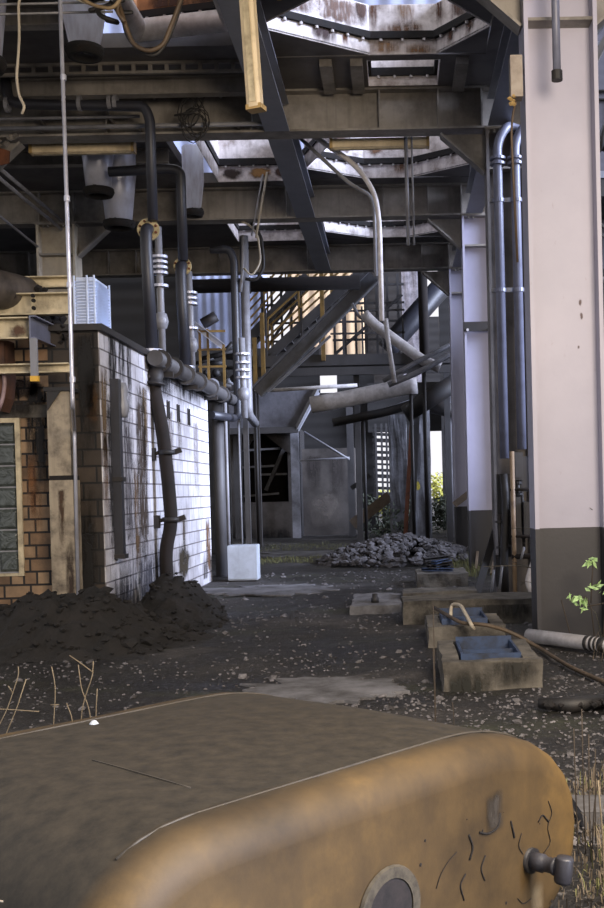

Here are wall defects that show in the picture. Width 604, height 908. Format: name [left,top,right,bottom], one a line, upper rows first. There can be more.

corrosion [293,0,377,42]
corrosion [389,5,421,31]
corrosion [12,325,26,337]
water stain [76,335,97,434]
water stain [168,412,181,459]
water stain [108,337,159,604]
water stain [82,514,95,589]